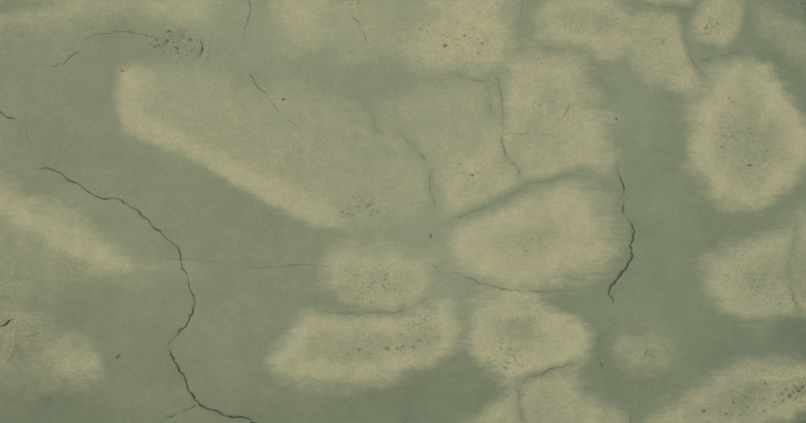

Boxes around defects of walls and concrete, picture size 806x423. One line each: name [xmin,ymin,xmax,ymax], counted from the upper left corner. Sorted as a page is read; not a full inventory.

crack [170,354,256,423]
damp [108,0,525,404]
damp [424,0,806,423]
crack [608,226,634,294]